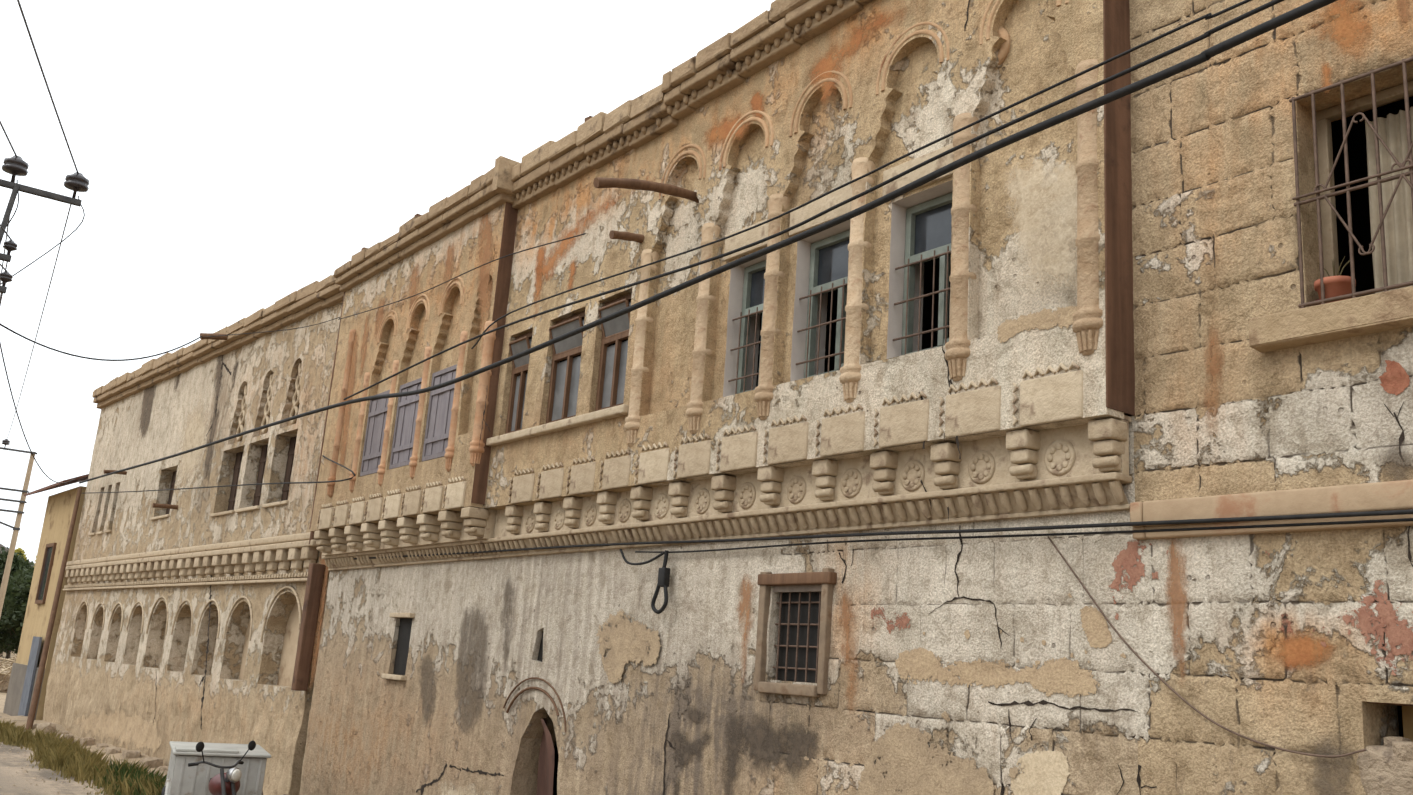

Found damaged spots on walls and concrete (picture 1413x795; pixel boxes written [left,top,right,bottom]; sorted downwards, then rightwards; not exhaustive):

crack [919,345,956,400]
spalling [1378,351,1410,396]
crack [1384,402,1405,462]
crack [920,433,1010,645]
peeling [1342,580,1413,676]
crack [988,700,1137,795]